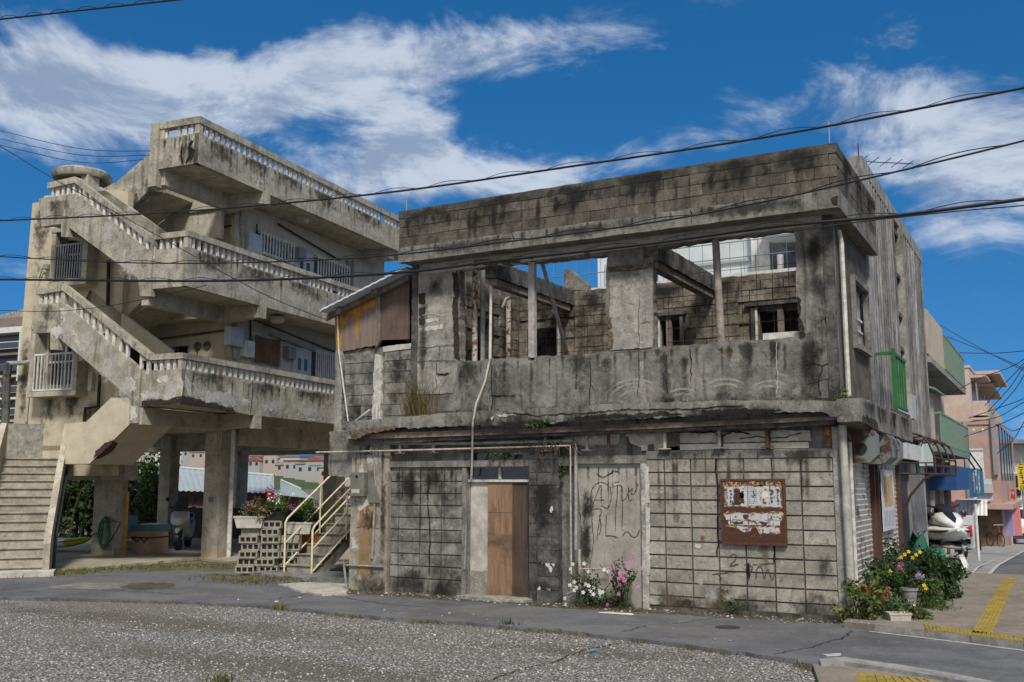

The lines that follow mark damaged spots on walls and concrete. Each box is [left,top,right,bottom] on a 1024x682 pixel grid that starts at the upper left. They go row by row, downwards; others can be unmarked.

water stain [434,195,511,251]
water stain [550,185,599,209]
water stain [620,171,690,216]
water stain [700,199,797,216]
peeling [49,308,87,353]
crack [776,343,828,396]
water stain [801,341,820,398]
peeling [126,375,273,421]
water stain [355,447,386,544]
water stain [397,469,457,522]
peeling [351,497,380,560]
water stain [360,572,456,596]